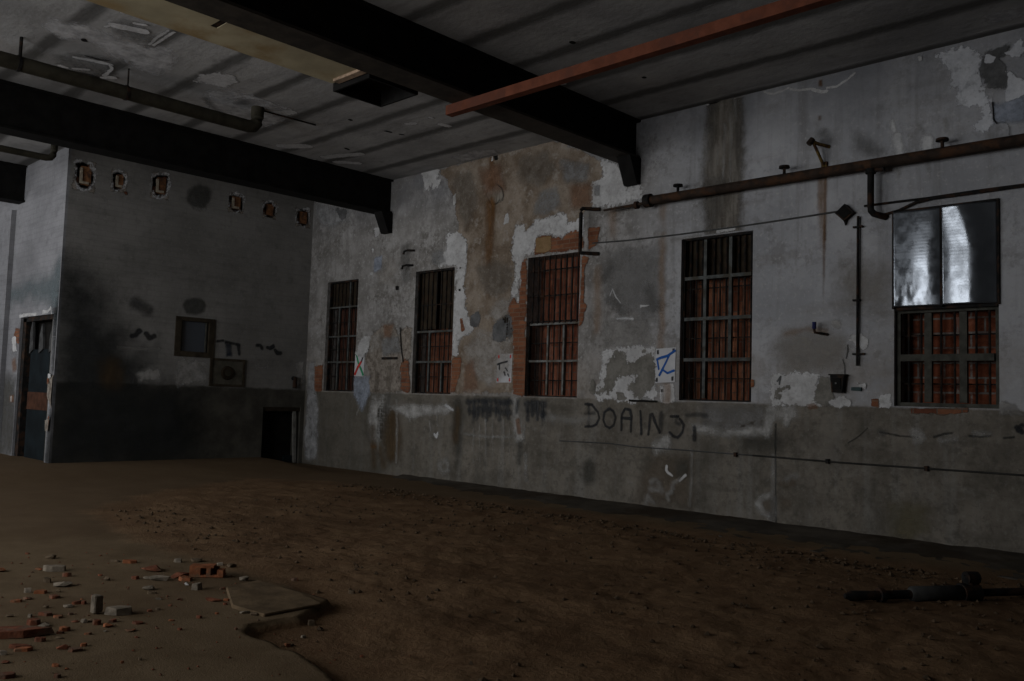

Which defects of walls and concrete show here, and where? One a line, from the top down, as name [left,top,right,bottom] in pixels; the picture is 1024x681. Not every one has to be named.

peeling [935,39,1024,133]
spalling [71,159,97,194]
hole [150,172,171,201]
leakage [703,97,745,234]
spalling [421,141,603,446]
peeling [589,343,658,405]
peeling [769,369,851,409]